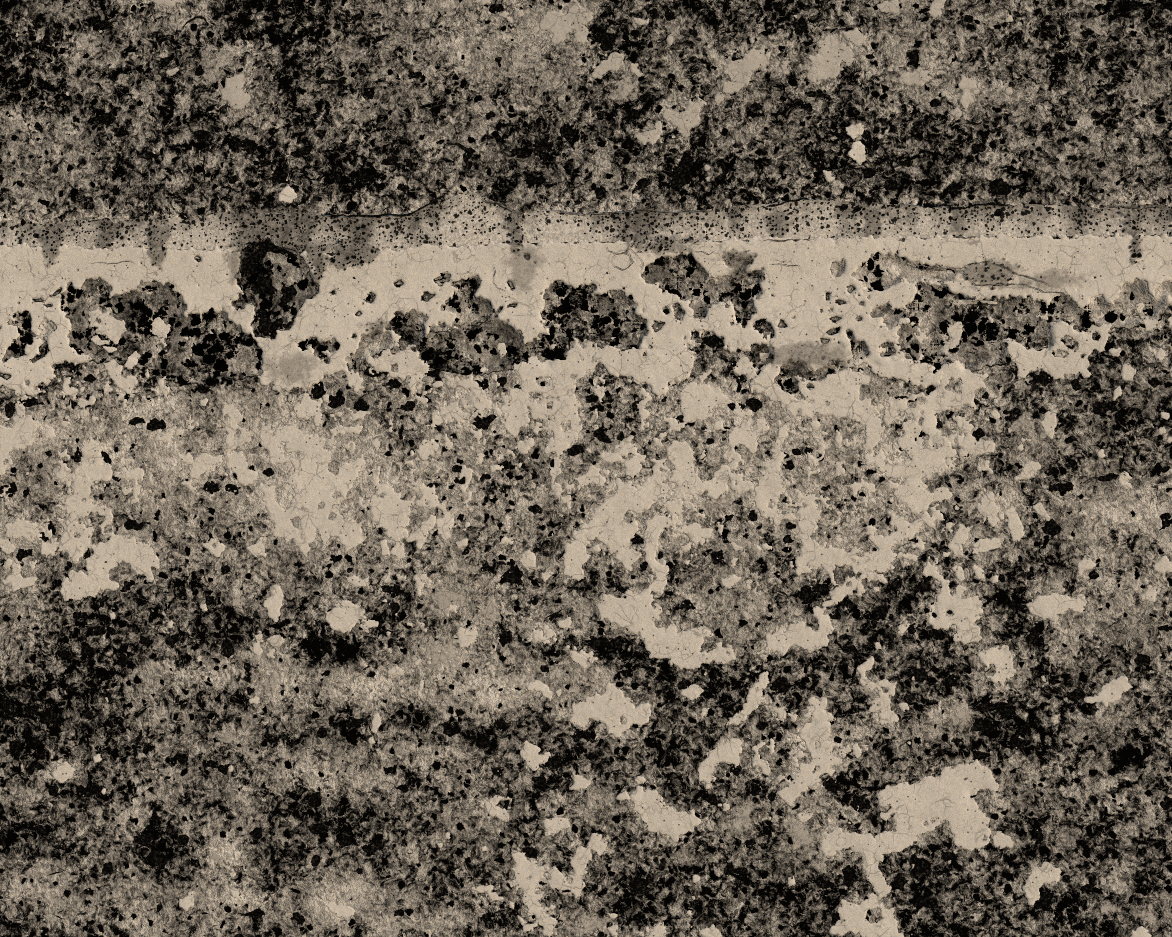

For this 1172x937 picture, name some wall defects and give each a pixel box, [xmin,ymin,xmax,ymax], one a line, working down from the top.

damp [144,217,171,270]
damp [226,206,380,284]
damp [625,205,704,254]
damp [761,209,794,238]
damp [860,203,886,239]
damp [1121,203,1147,263]
peeling [0,232,1172,719]
peeling [569,682,652,742]
peeling [616,775,701,843]
peeling [698,671,789,841]
peeling [777,642,1017,937]
peeling [470,833,619,937]